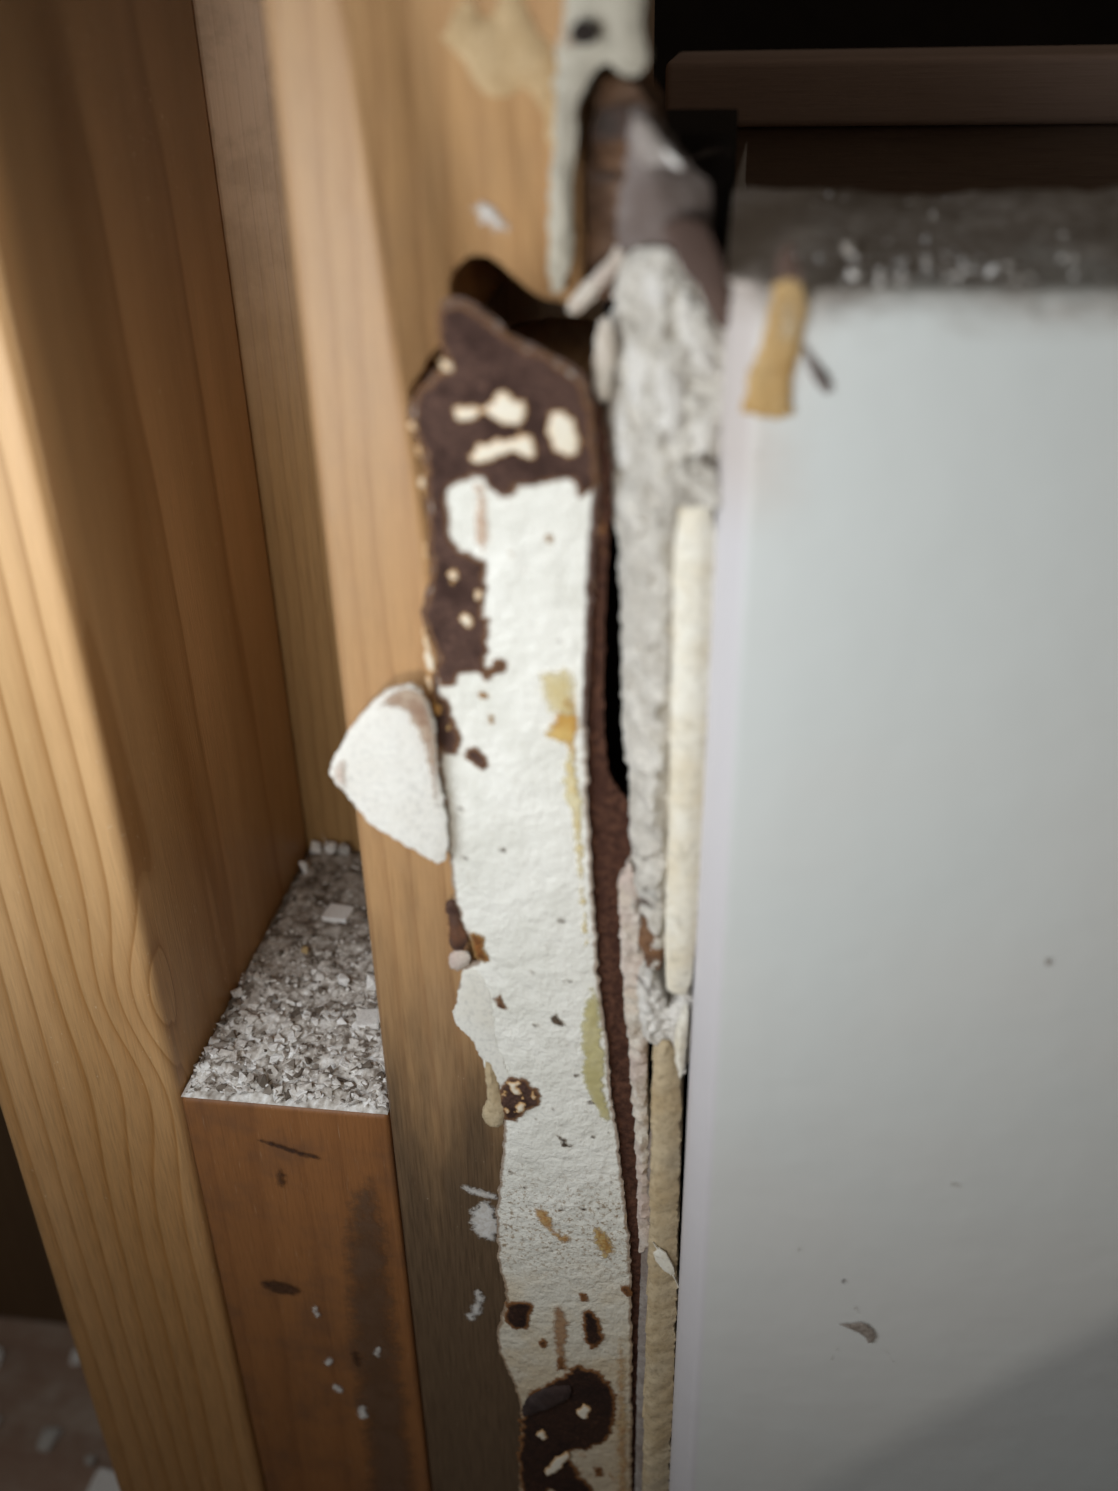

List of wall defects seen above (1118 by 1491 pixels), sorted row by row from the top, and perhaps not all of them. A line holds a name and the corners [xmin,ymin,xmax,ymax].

flaking render [603,243,725,971]
peeling [329,682,467,864]
flaking render [366,974,376,990]
peeling [445,899,510,1085]